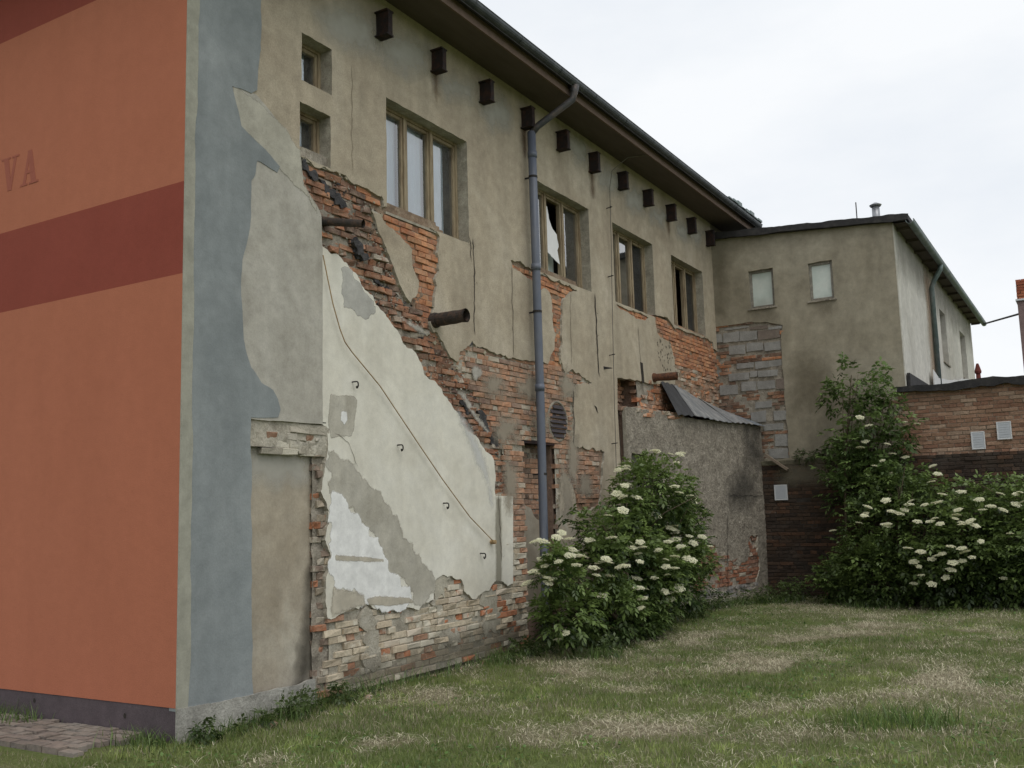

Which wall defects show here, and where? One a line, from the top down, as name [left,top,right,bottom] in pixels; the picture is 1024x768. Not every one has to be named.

spalling [233,87,603,699]
spalling [617,306,790,460]
spalling [693,535,759,602]